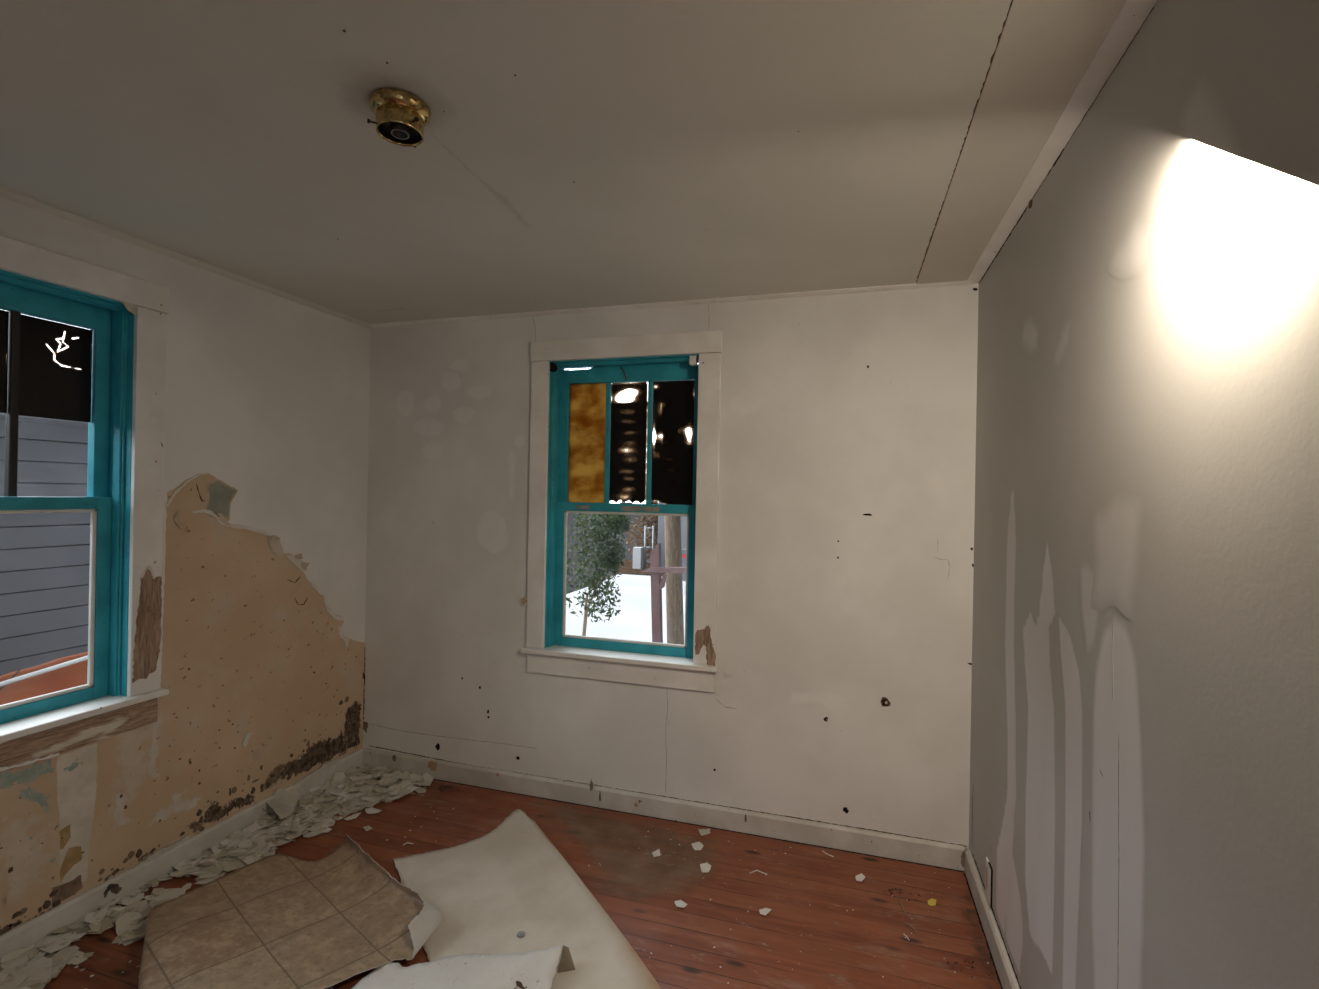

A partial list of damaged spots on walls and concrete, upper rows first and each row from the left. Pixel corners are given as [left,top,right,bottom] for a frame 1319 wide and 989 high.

peeling [0,473,368,931]
leakage [179,696,362,837]
peeling [695,624,716,666]
leakage [97,844,161,882]